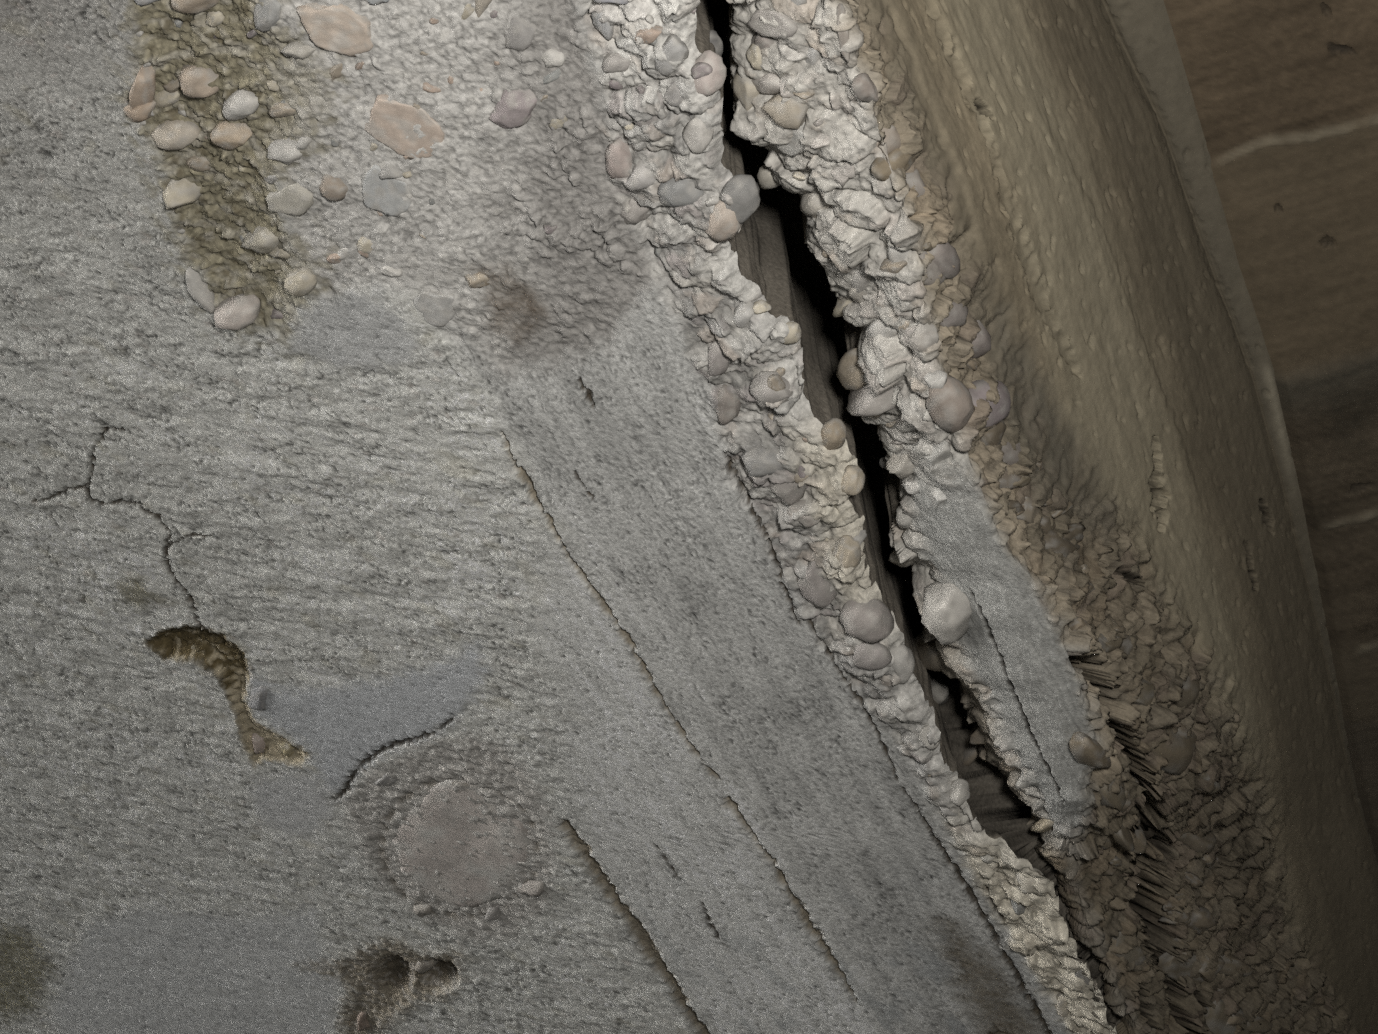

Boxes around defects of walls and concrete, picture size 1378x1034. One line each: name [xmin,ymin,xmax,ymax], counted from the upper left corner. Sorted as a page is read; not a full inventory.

spalling [123,0,659,378]
crack [31,426,212,630]
spalling [573,470,595,500]
spalling [576,377,595,409]
crack [695,0,1215,1034]
spalling [580,0,1352,1034]
spalling [143,623,312,768]
crack [333,714,455,803]
spalling [331,733,711,1034]
crack [500,431,857,1003]